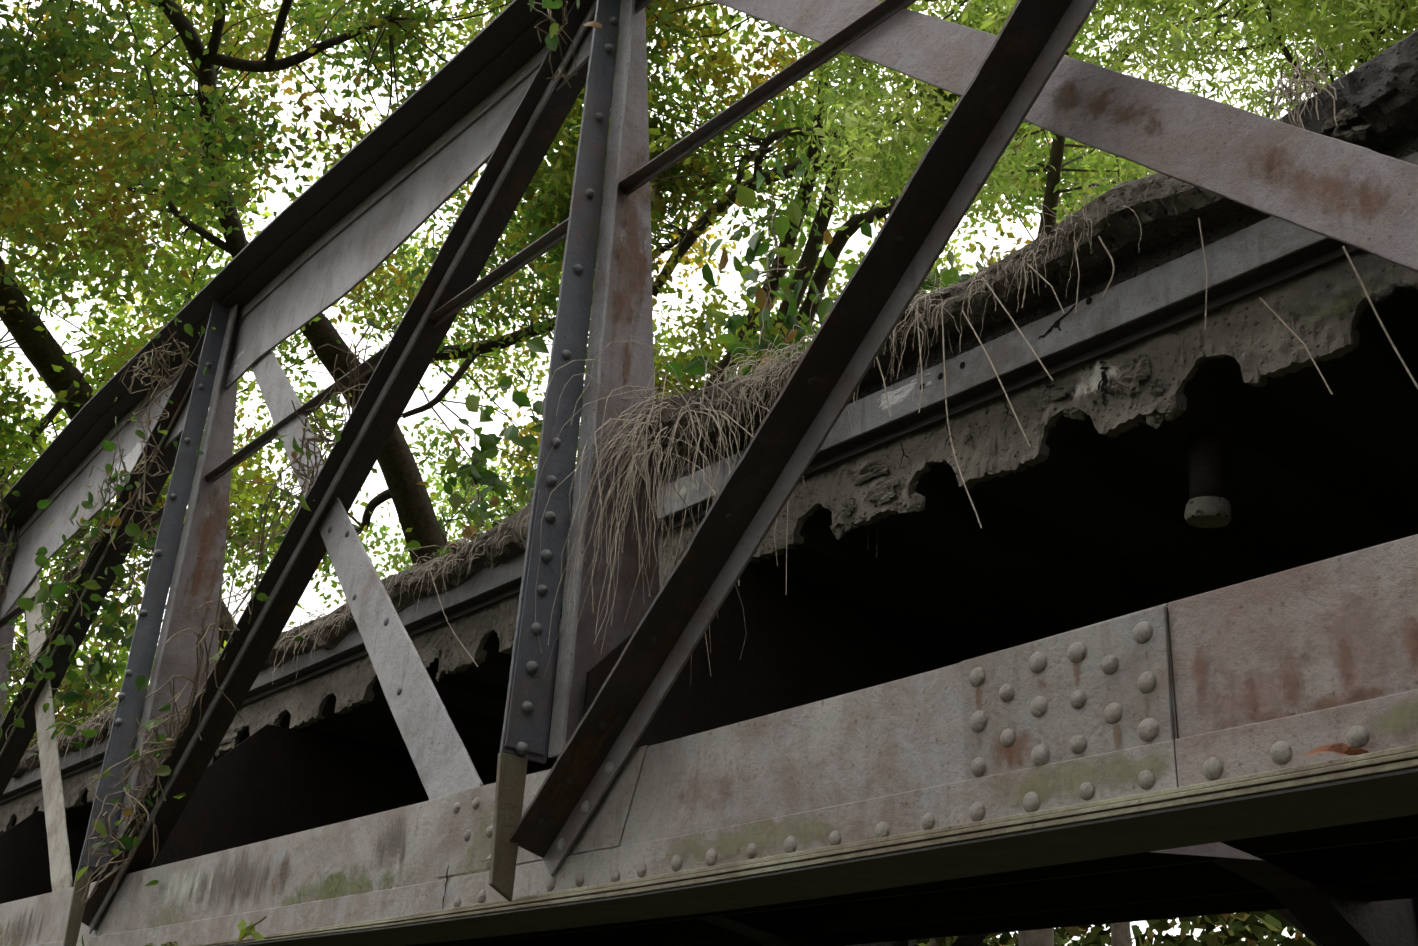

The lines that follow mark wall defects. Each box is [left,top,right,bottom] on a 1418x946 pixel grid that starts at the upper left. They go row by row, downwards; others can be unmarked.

peeling [878,372,933,410]
spalling [1035,383,1088,420]
spalling [1145,377,1181,429]
spalling [830,477,925,540]